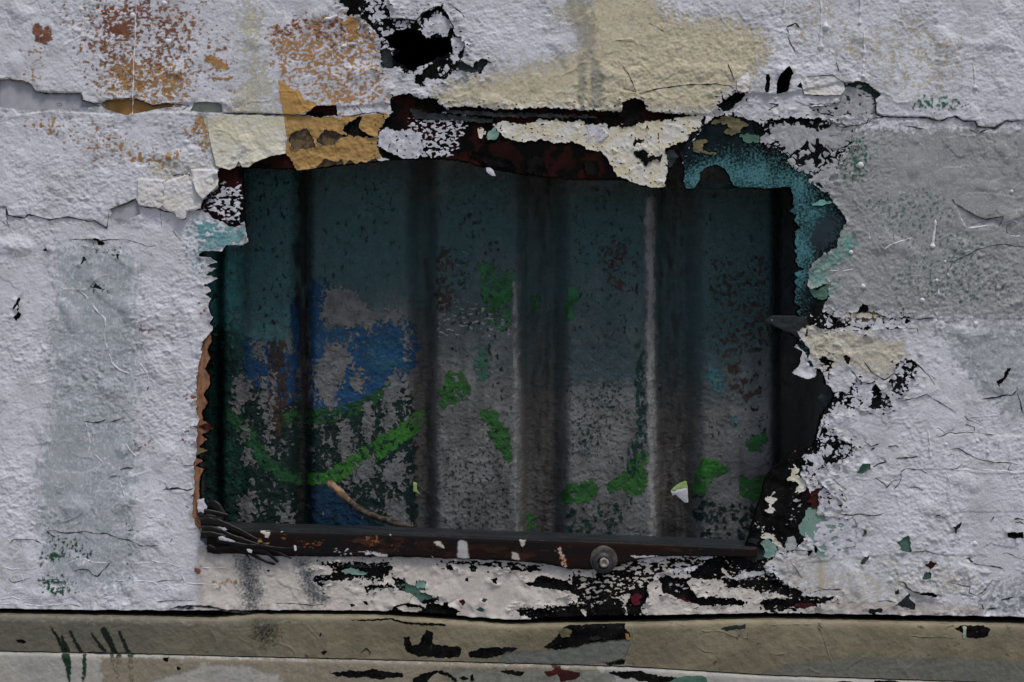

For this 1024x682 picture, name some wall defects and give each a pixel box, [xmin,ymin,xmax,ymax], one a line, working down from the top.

crack [2,77,189,110]
rust [19,0,237,114]
crack [227,110,308,118]
crack [769,63,1020,151]
crack [3,187,219,246]
peeling [110,0,912,467]
peeling [310,182,419,525]
peeling [192,331,213,529]
peeling [436,334,919,650]
rust [351,535,537,562]
peeling [544,665,580,682]
peeling [605,659,707,682]